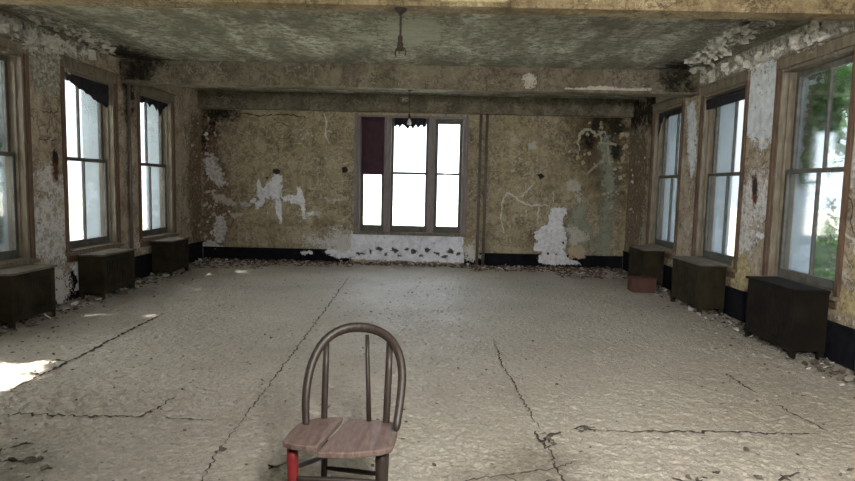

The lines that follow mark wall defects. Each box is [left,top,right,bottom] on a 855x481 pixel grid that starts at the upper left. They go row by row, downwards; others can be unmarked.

corrosion [51,151,59,183]
flaking render [191,117,482,263]
peeling [533,178,590,266]
water stain [562,97,656,256]
peeling [663,19,855,261]
crack [11,314,162,390]
crack [465,462,572,481]
crack [576,425,821,435]